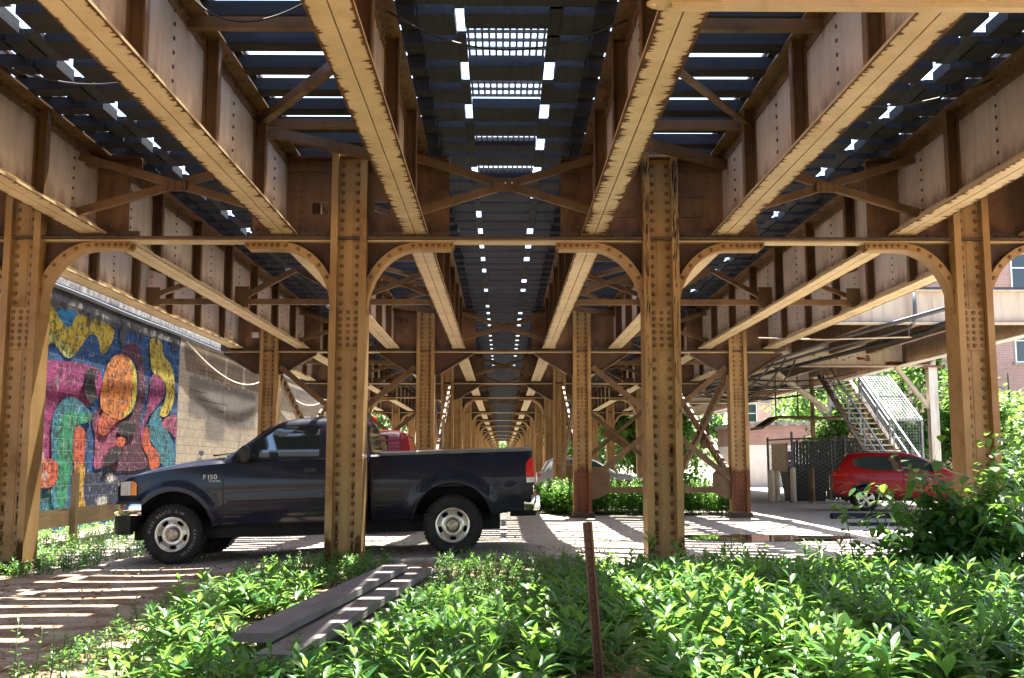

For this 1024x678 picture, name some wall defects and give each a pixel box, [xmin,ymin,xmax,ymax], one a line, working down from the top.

rust [732,470,751,512]